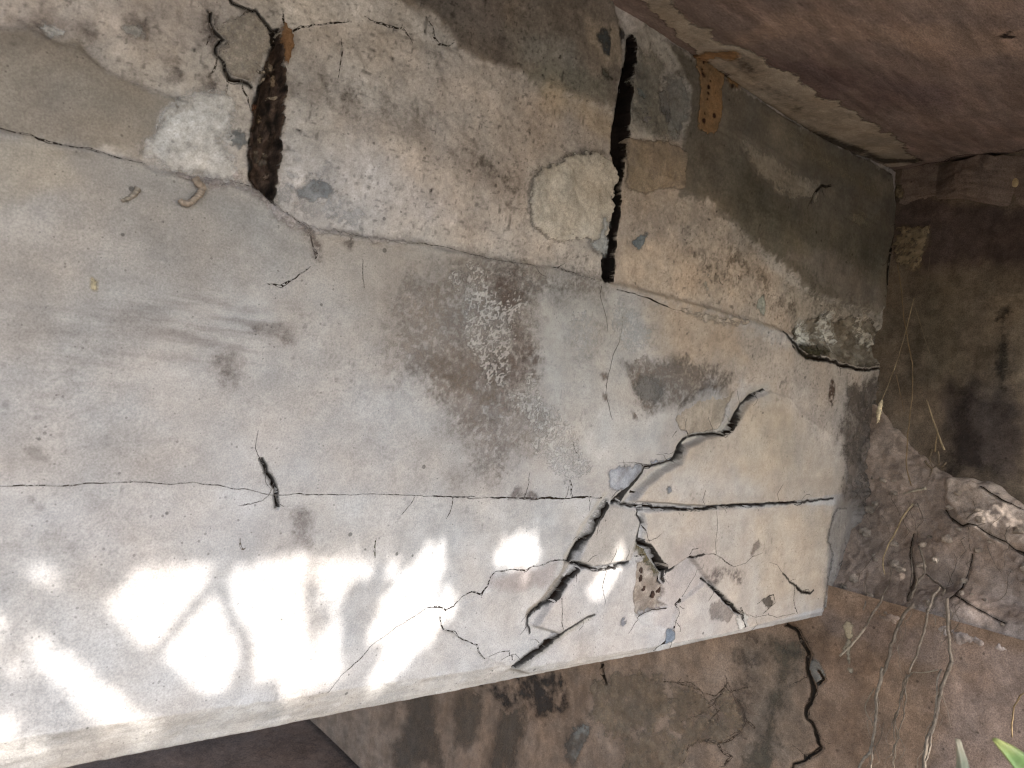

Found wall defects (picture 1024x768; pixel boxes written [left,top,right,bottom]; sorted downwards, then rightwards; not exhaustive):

crack [0,128,144,164]
crack [206,0,455,112]
corrosion [693,51,740,134]
crack [232,181,318,288]
damp [393,258,599,477]
crack [338,231,746,420]
damp [611,307,733,419]
crack [783,331,880,375]
spalling [792,312,879,368]
crack [0,388,834,768]
spalling [621,561,663,626]